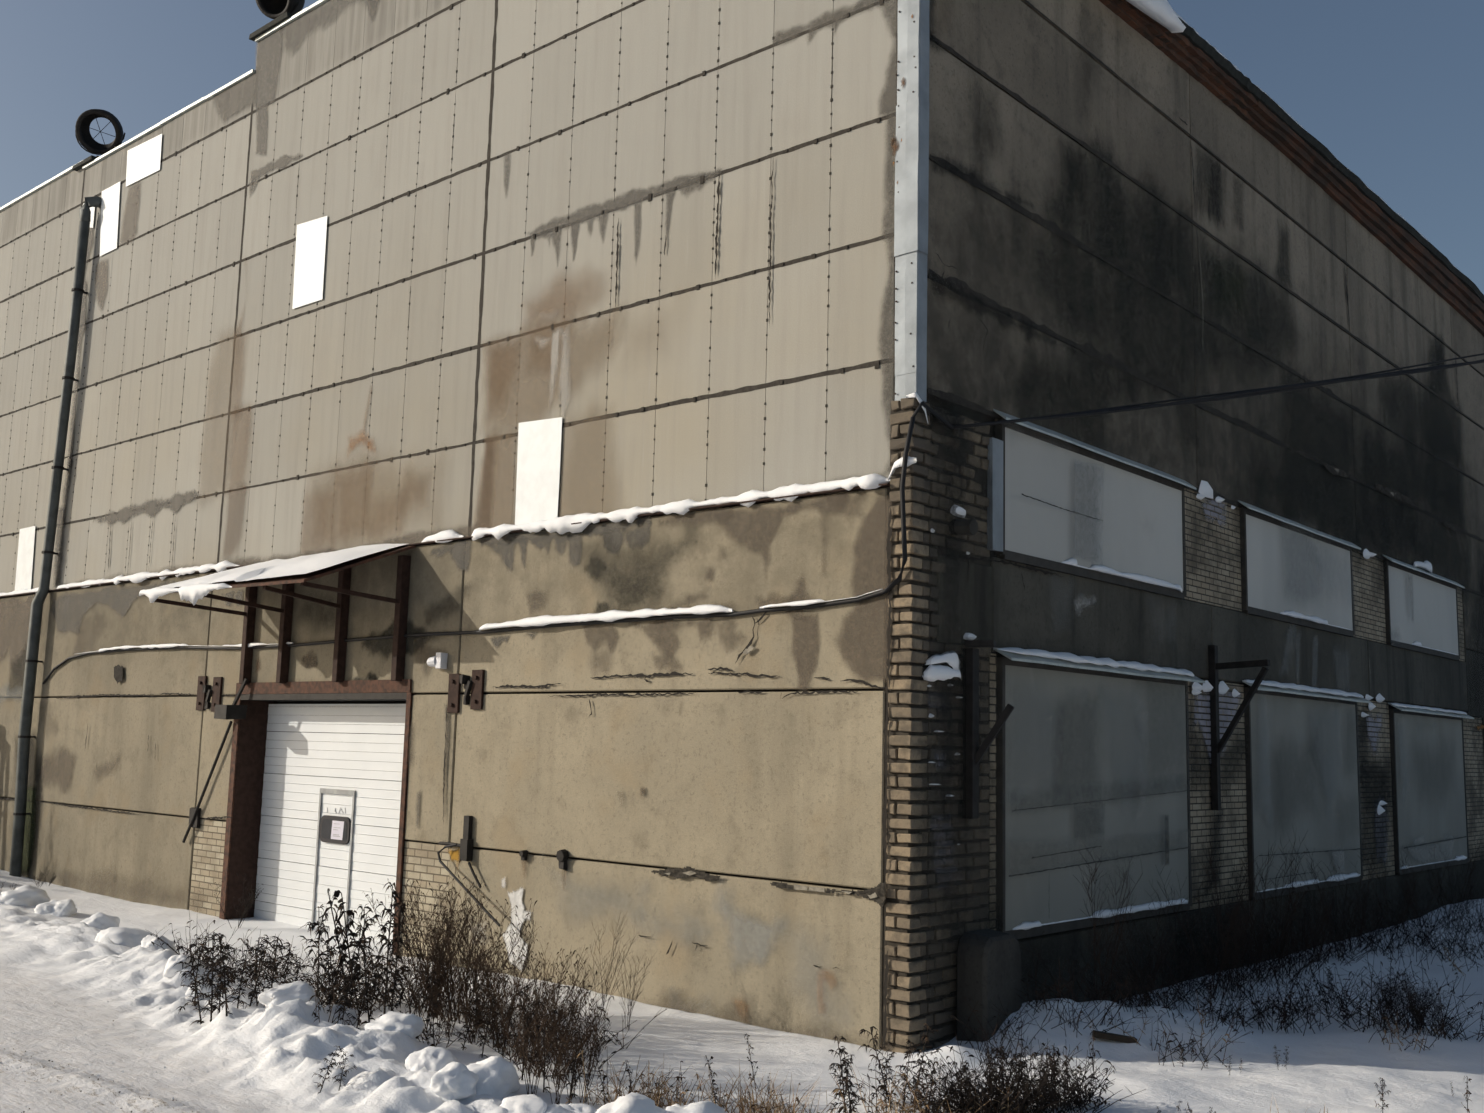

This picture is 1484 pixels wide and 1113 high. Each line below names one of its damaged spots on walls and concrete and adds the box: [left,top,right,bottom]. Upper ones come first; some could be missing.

water stain [213,0,378,194]
water stain [531,170,721,260]
water stain [774,0,898,439]
water stain [1041,148,1293,376]
rust [531,331,568,414]
rust [486,436,512,527]
water stain [1256,345,1468,591]
water stain [228,551,332,570]
water stain [302,654,317,668]
water stain [362,590,462,668]
water stain [384,492,891,689]